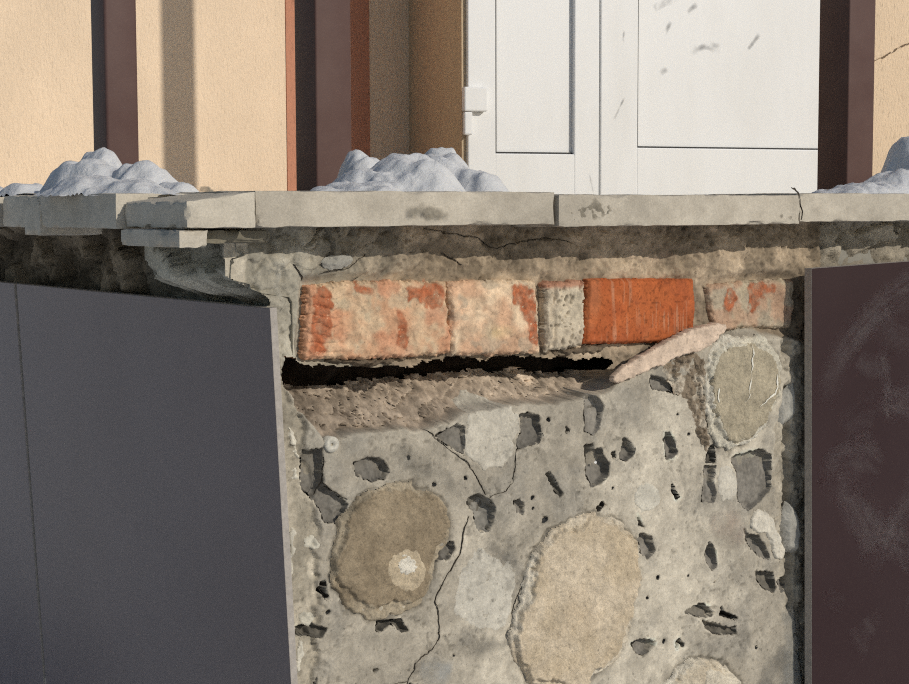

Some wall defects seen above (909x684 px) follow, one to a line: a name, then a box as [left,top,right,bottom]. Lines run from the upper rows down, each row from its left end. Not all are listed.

crack [791,187,803,220]
spalling [299,448,348,523]
crack [423,429,517,498]
spalling [562,387,636,488]
peeling [609,322,726,504]
spalling [731,450,772,511]
spalling [704,541,717,571]
spalling [744,530,773,560]
spalling [295,622,327,638]
spalling [375,618,408,633]
crack [396,516,469,684]
spalling [685,603,737,635]